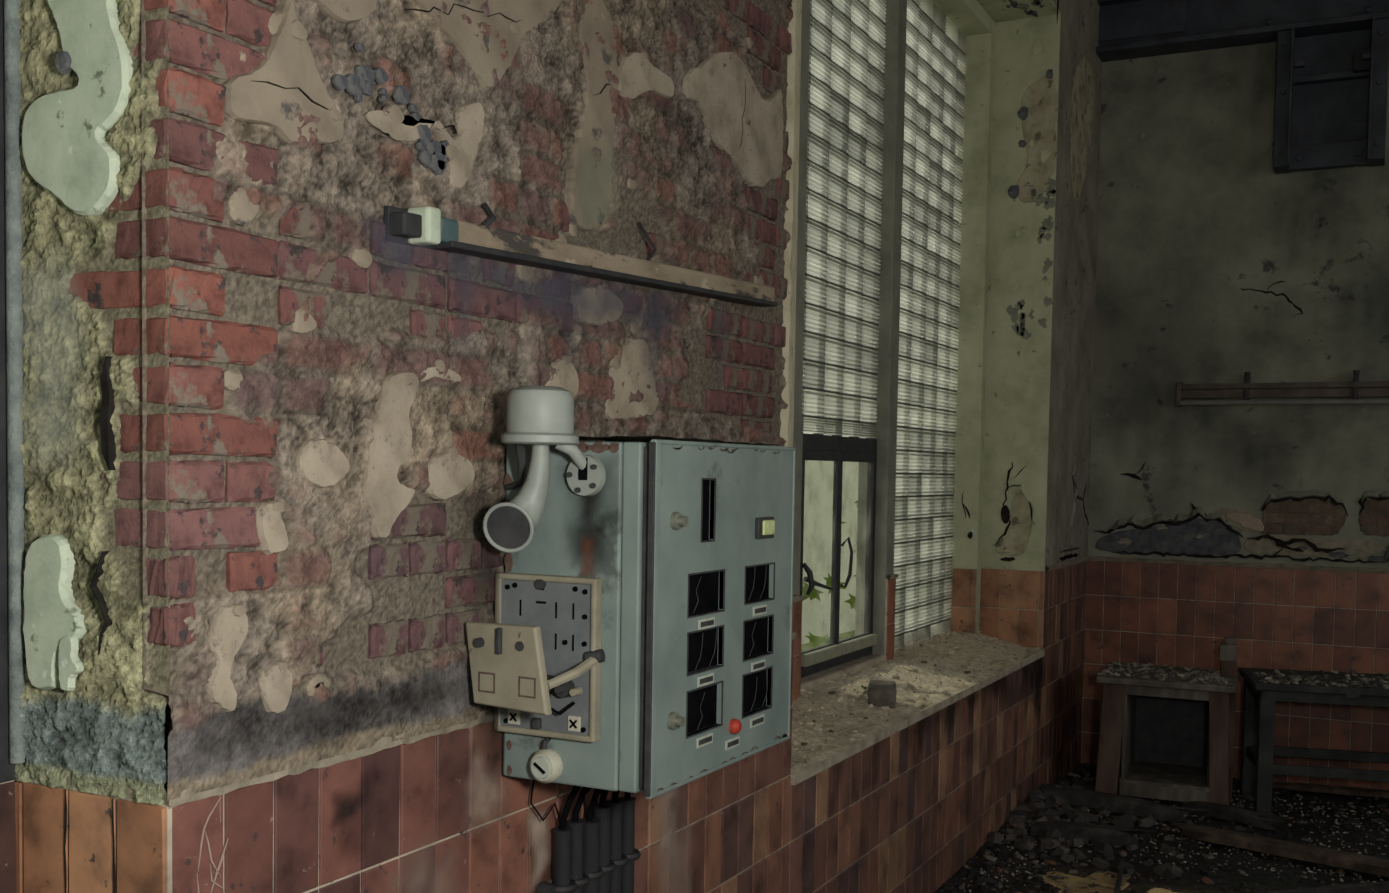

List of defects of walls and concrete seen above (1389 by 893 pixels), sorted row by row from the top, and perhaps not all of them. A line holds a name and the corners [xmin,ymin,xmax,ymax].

peeling [555,0,792,300]
crack [1241,281,1303,318]
crack [100,356,117,470]
spalling [22,0,659,714]
spalling [705,308,786,437]
spalling [1215,489,1389,562]
crack [90,551,112,655]
crack [61,789,69,893]
crack [110,798,118,893]
crack [196,795,229,893]